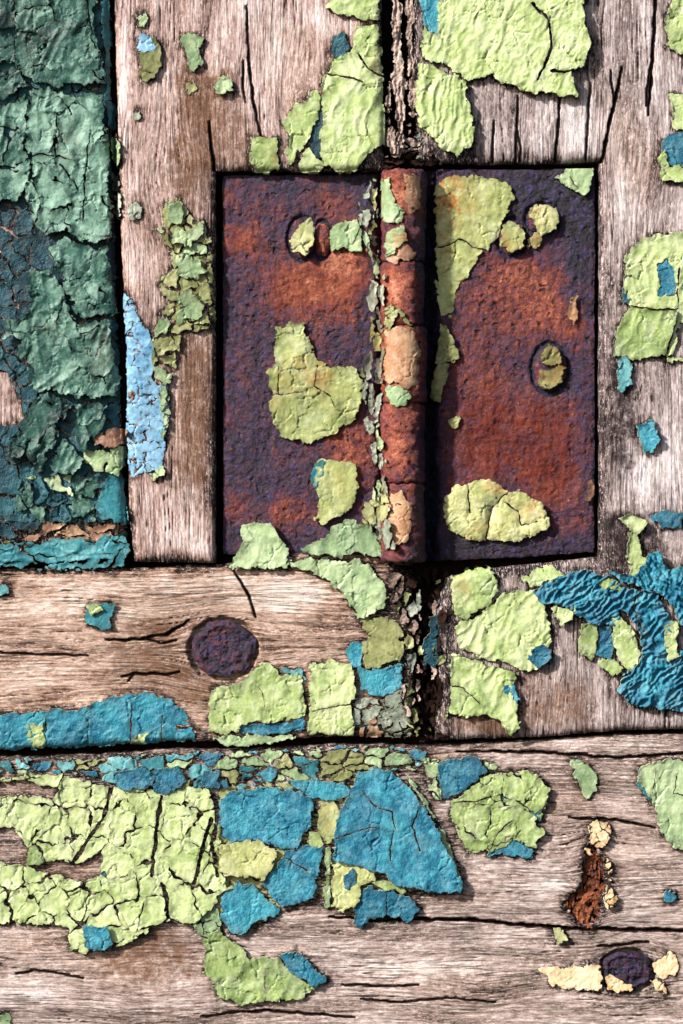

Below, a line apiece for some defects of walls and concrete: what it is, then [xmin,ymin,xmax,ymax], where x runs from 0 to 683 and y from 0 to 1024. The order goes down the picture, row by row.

peeling [0,0,216,571]
peeling [249,0,594,469]
peeling [613,231,683,393]
rust [114,622,190,680]
crack [233,570,256,618]
peeling [0,458,683,1006]